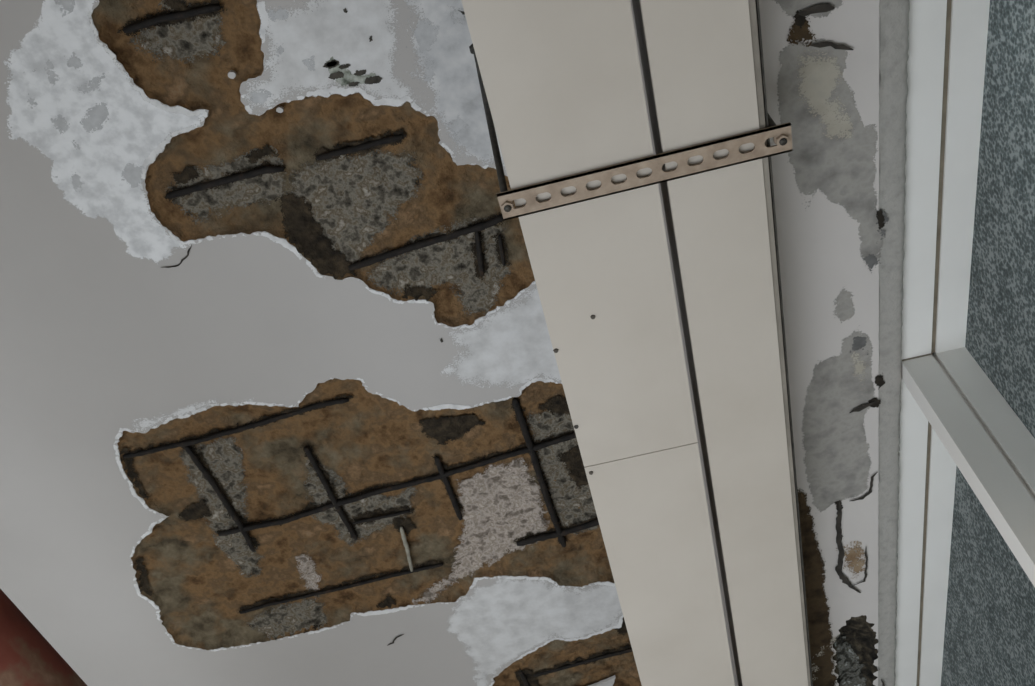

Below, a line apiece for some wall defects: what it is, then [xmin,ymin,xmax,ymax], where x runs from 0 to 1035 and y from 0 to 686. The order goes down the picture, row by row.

peeling [774,0,842,18]
peeling [777,38,889,273]
spalling [4,0,642,686]
peeling [801,289,885,511]